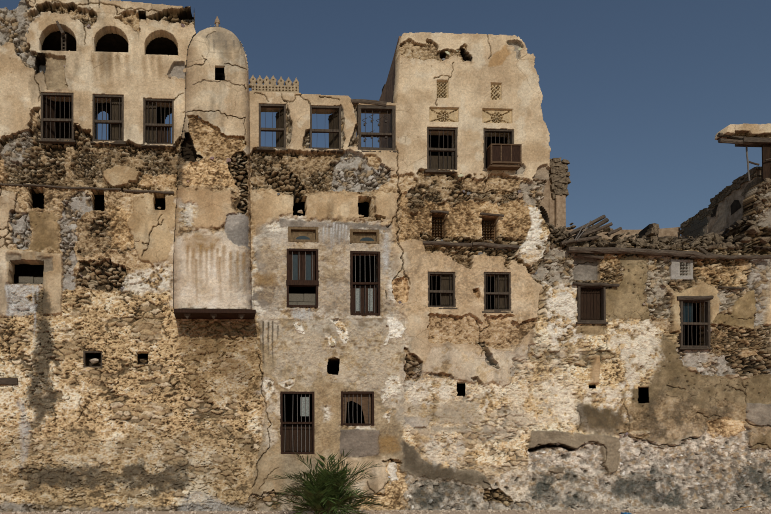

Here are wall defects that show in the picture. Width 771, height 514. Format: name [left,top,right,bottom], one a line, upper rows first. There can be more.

spalling [395,38,472,62]
crack [0,186,28,249]
crack [141,215,163,256]
spalling [0,104,395,292]
crack [385,148,411,298]
spalling [398,164,549,269]
peeling [384,316,406,344]
spalling [676,255,771,376]
crack [252,356,279,489]
spalling [381,347,454,422]
crack [726,383,771,450]